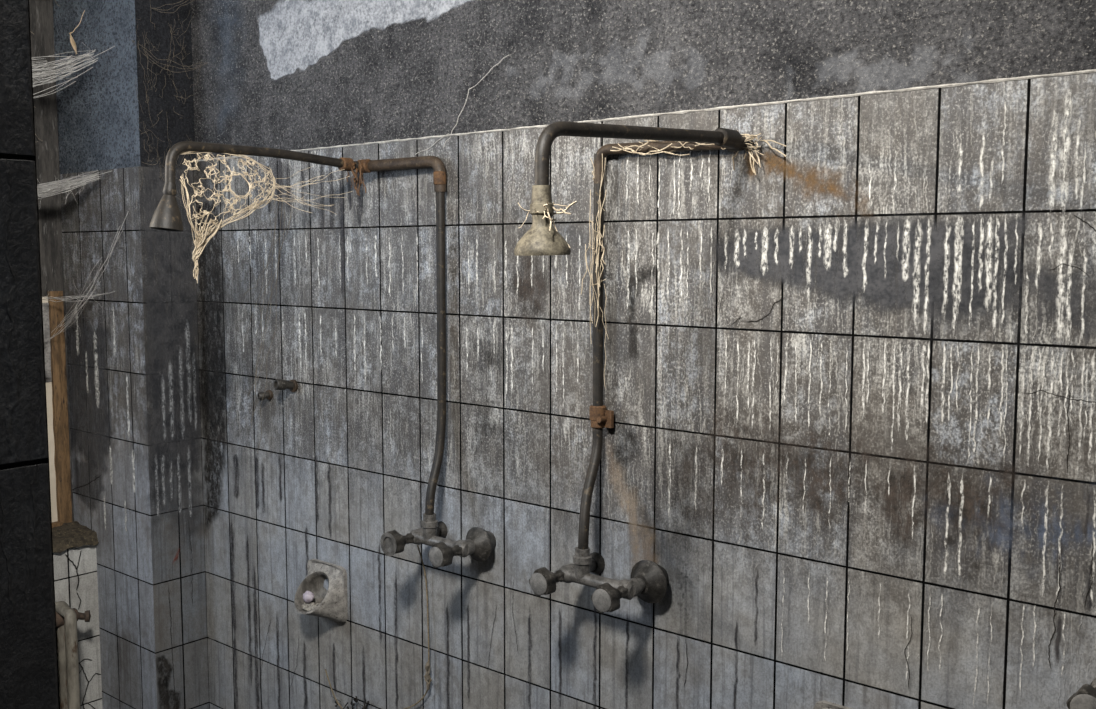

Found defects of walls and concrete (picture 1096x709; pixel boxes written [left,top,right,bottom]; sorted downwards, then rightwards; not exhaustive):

peeling [258,0,471,80]
damp [294,165,363,295]
rust [747,154,842,195]
damp [626,95,1096,356]
peeling [42,303,52,382]
damp [67,307,116,528]
damp [140,157,239,526]
damp [718,340,850,527]
damp [882,343,930,442]
damp [941,346,1008,458]
damp [1019,351,1095,465]
damp [932,467,1096,674]